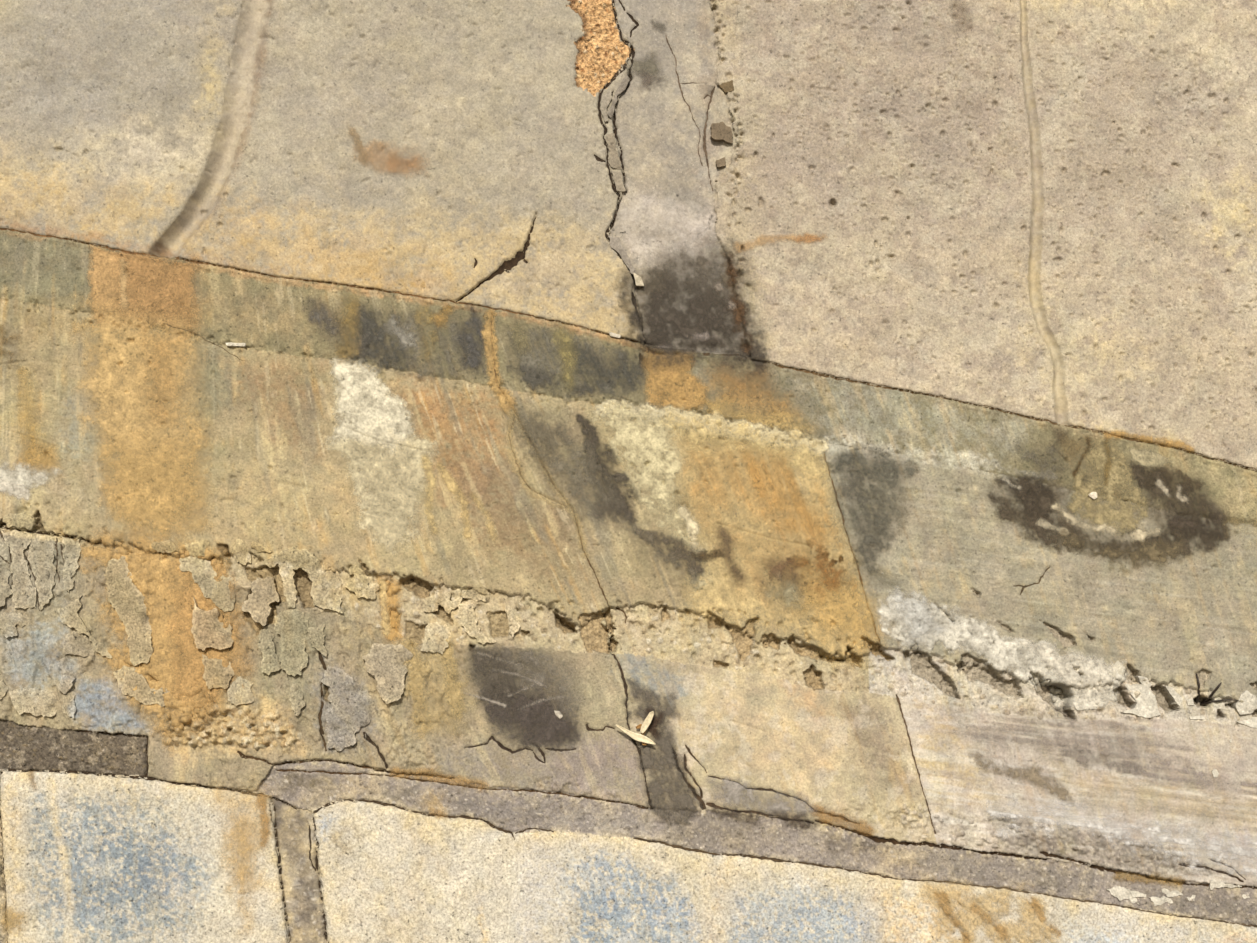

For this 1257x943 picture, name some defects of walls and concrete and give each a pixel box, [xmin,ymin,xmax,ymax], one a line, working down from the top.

spalling [567,0,635,193]
crack [594,0,715,250]
water stain [621,246,765,368]
peeling [0,512,170,719]
peeling [151,539,530,751]
water stain [309,302,493,550]
crack [0,213,1257,943]
water stain [508,328,916,589]
water stain [762,559,799,607]
spalling [708,613,1098,721]
water stain [989,432,1229,565]
spalling [1108,661,1257,728]